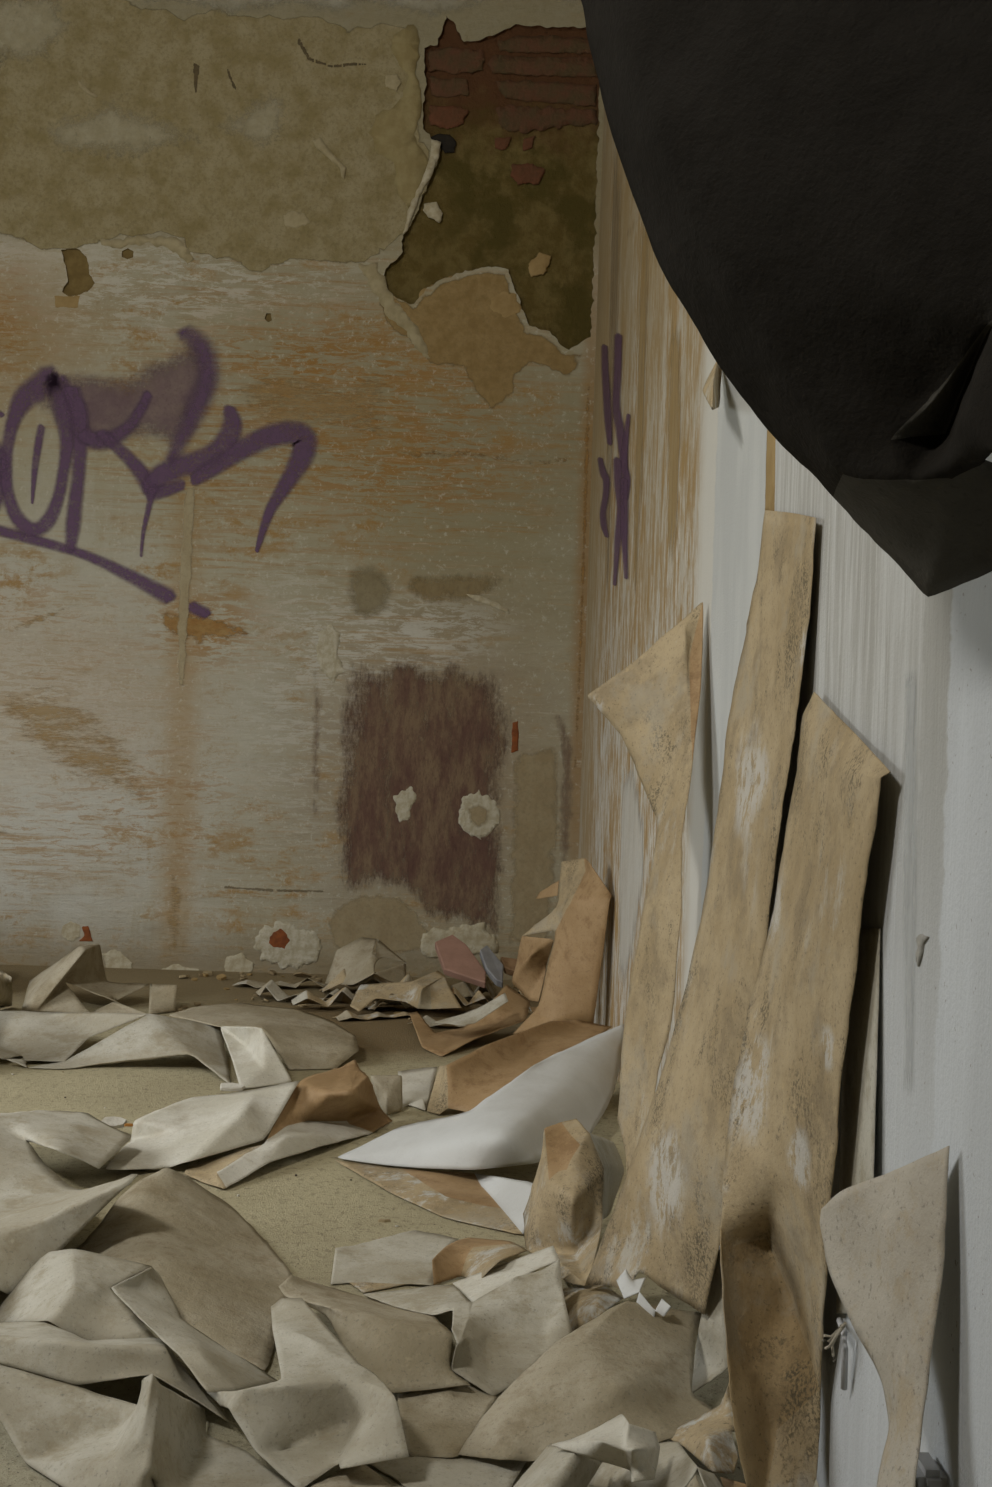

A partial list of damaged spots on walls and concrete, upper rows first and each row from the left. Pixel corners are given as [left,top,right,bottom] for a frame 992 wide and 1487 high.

peeling [0,0,600,408]
leakage [469,805,487,826]